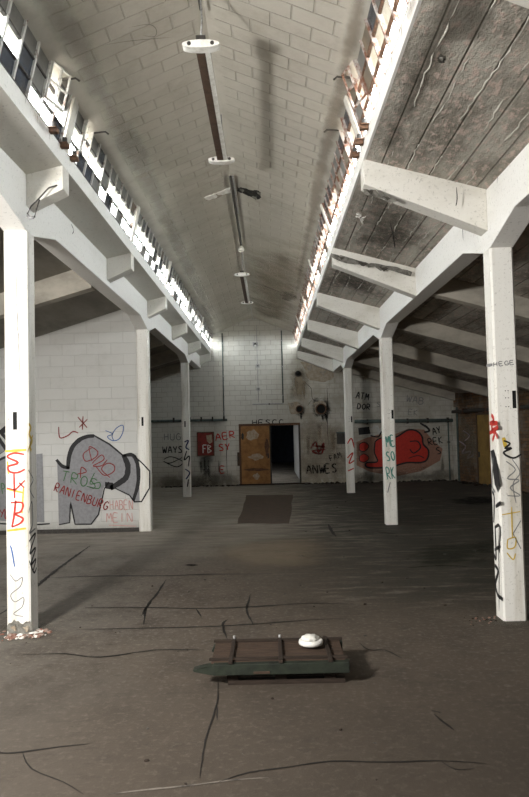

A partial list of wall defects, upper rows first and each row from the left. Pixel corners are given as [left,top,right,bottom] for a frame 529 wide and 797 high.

crack [85,574,343,638]
crack [0,744,84,794]